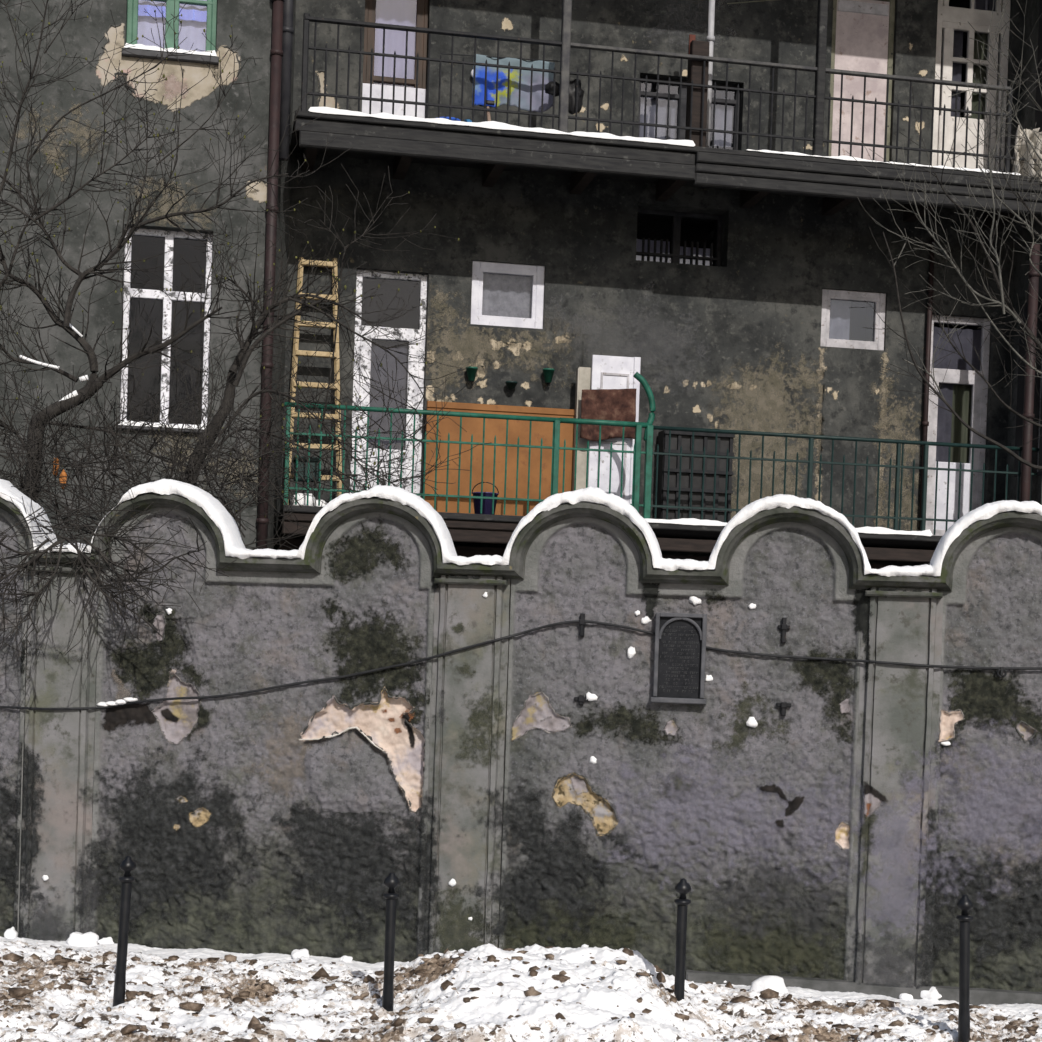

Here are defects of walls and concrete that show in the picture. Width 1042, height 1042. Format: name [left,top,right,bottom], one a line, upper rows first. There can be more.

peeling [96,23,240,112]
peeling [452,338,532,404]
flaking render [96,669,213,744]
flaking render [299,687,425,815]
flaking render [939,709,965,746]
flaking render [173,796,212,831]
water stain [0,741,440,957]
water stain [473,780,625,943]
flaking render [552,772,619,836]
water stain [603,828,643,860]
flaking render [833,782,888,876]
water stain [711,806,1042,989]